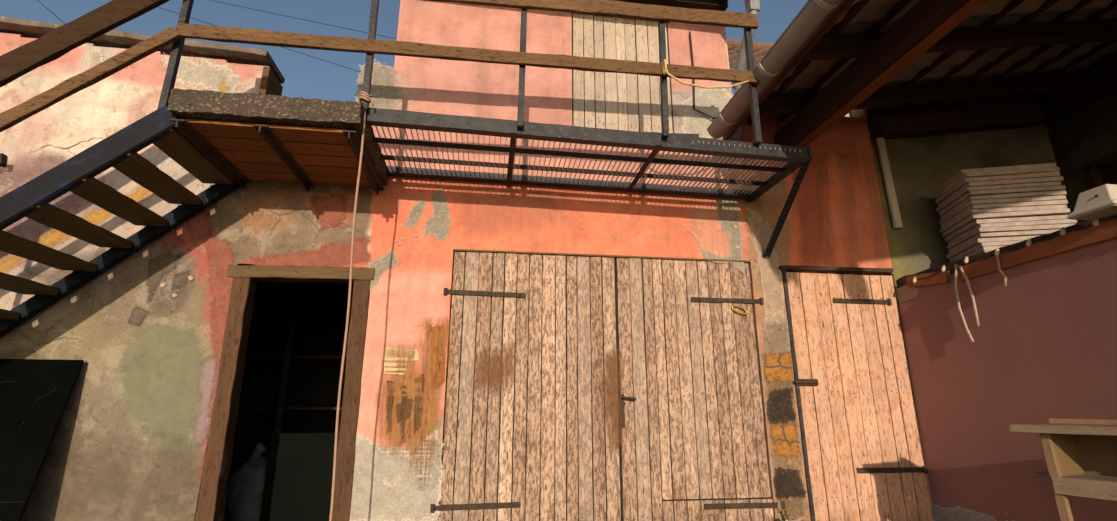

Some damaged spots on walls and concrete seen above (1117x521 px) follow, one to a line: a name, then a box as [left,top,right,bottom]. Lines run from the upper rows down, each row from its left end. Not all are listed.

peeling [0,92,20,113]
peeling [137,90,161,118]
peeling [355,59,404,109]
spalling [0,153,10,168]
peeling [250,187,451,291]
peeling [128,212,233,445]
peeling [350,430,445,521]